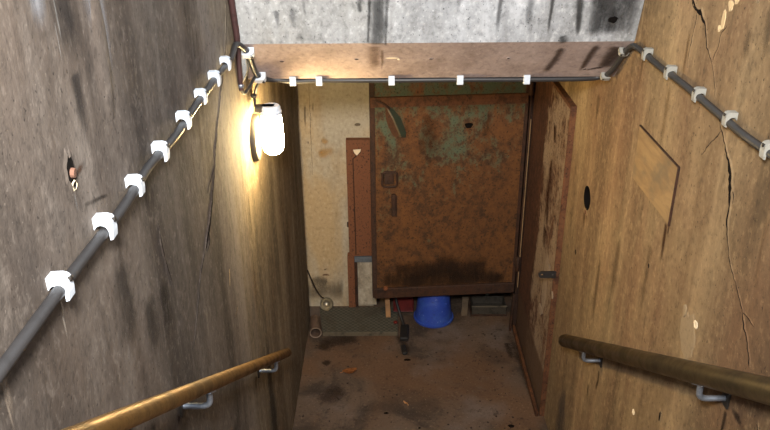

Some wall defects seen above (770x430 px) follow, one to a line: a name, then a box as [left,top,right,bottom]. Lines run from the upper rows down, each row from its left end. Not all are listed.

water stain [358,0,388,44]
water stain [591,0,636,32]
crack [687,0,728,98]
crack [193,4,227,347]
crack [702,119,755,368]